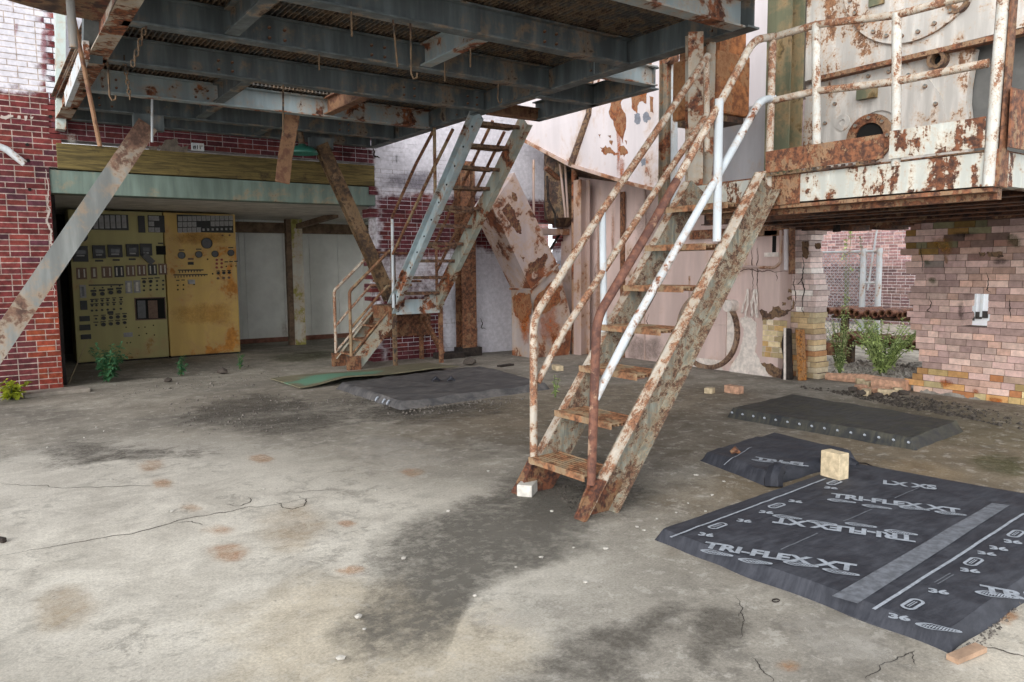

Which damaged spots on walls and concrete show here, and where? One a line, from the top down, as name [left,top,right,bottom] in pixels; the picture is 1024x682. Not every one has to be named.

leakage [341,461,604,648]